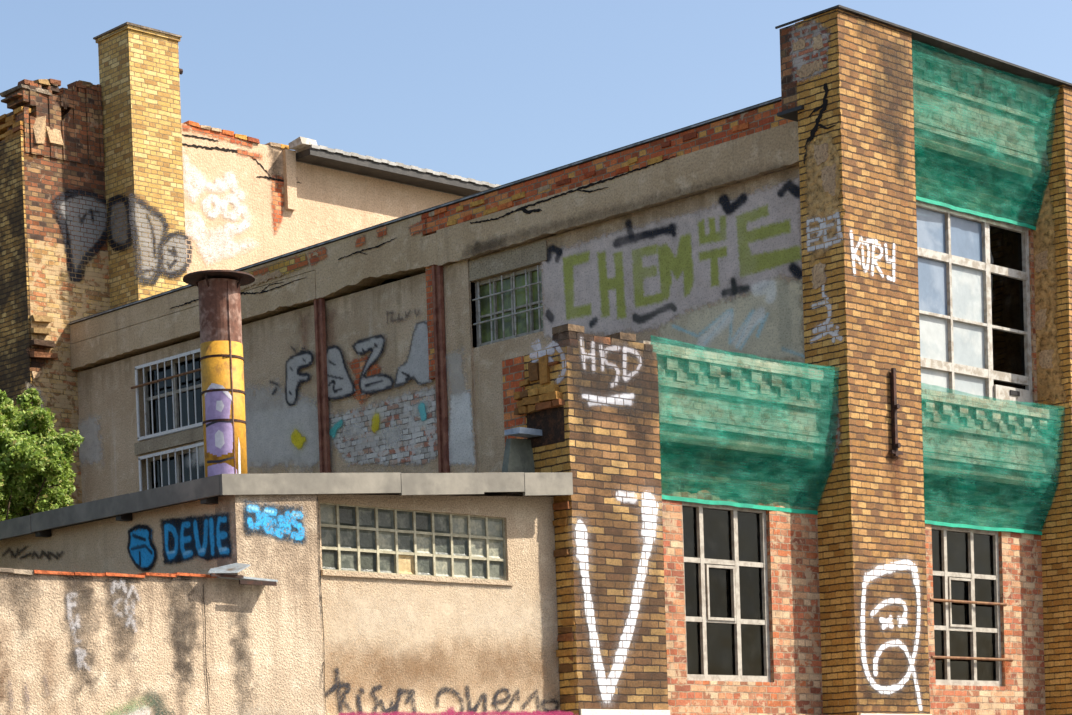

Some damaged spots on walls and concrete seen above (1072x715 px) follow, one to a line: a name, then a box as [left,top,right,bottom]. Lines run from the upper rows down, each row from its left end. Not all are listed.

spalling [789,21,830,82]
crack [182,134,300,183]
crack [470,155,677,224]
crack [803,83,837,164]
flaking render [329,356,438,465]
leakage [173,607,195,679]